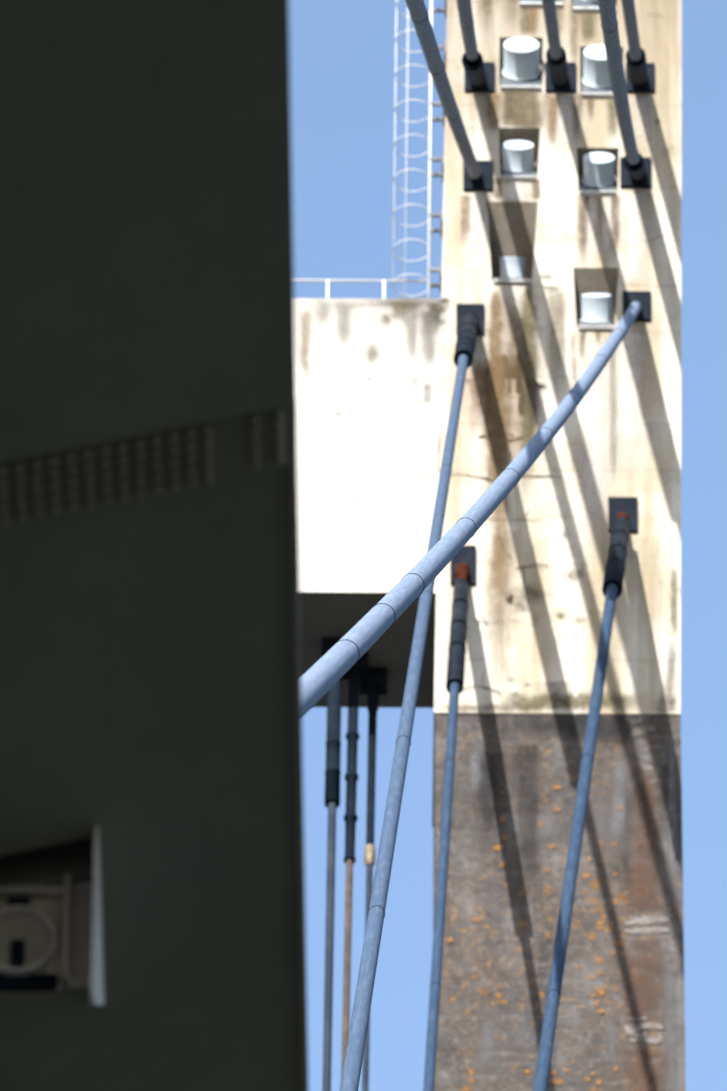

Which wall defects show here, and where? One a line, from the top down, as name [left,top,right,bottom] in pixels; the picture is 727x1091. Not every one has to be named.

water stain [521,7,536,31]
water stain [583,12,594,36]
water stain [608,99,616,128]
water stain [507,181,525,200]
water stain [504,287,545,448]
water stain [511,693,629,727]